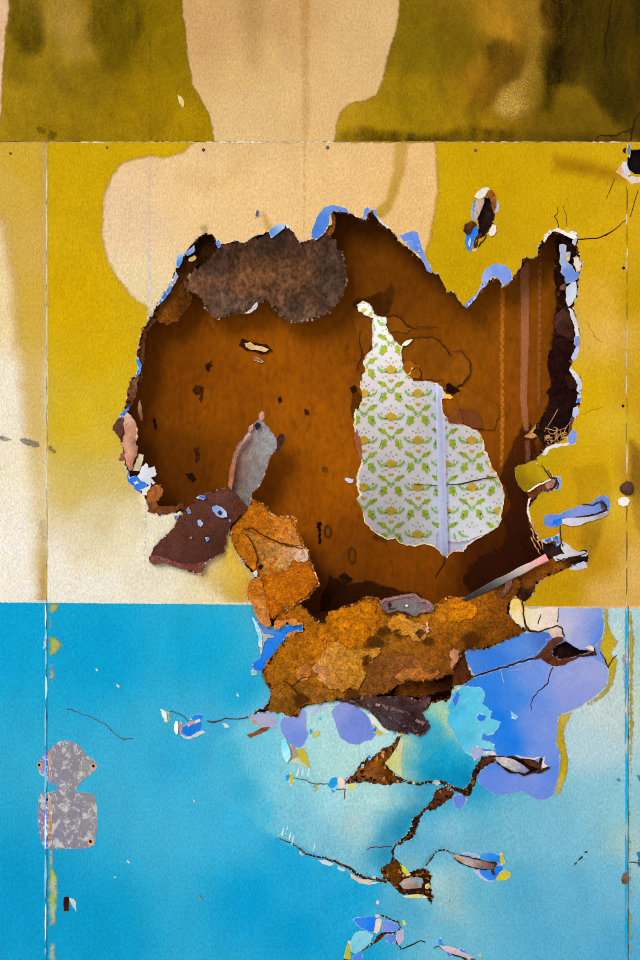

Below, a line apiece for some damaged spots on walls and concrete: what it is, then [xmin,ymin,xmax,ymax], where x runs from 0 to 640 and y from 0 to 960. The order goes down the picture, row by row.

spalling [463,187,499,251]
spalling [592,141,640,282]
peeling [112,205,640,955]
peeling [37,551,97,960]
crack [280,827,482,960]
crack [367,755,497,850]
crack [425,849,511,882]